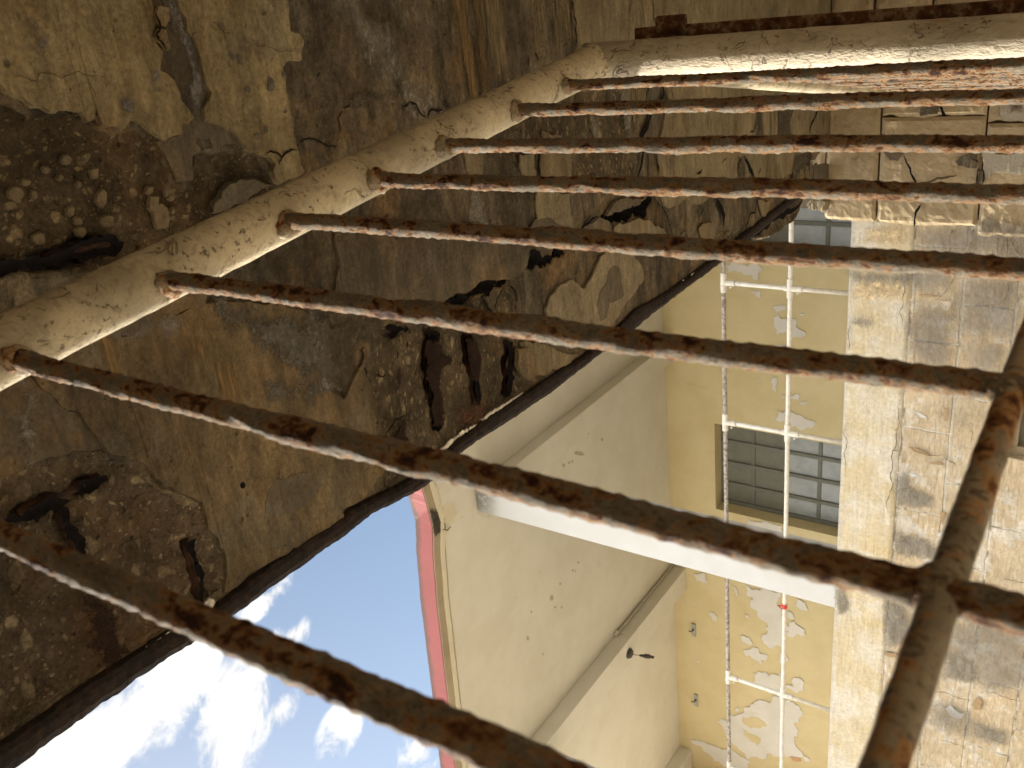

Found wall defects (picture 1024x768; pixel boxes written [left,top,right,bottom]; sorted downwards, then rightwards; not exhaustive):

flaking render [569,0,830,53]
spalling [0,0,305,280]
crack [268,104,350,164]
crack [402,99,450,118]
flaking render [505,151,828,179]
flaking render [507,89,830,139]
flaking render [331,231,563,314]
flaking render [544,252,644,326]
spalling [366,322,579,449]
spalling [0,376,224,603]
spalling [0,551,165,737]
corrosion [82,593,130,671]